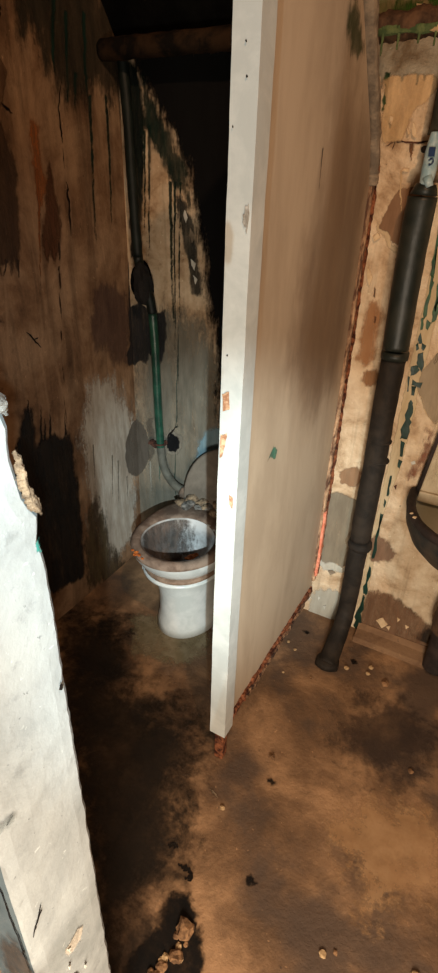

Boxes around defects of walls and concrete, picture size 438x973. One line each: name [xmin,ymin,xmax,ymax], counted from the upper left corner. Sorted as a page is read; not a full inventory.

leakage [0,122,21,276]
leakage [15,0,221,522]
peeling [381,73,437,142]
spalling [0,392,9,416]
leakage [14,401,125,594]
peeling [353,235,438,629]